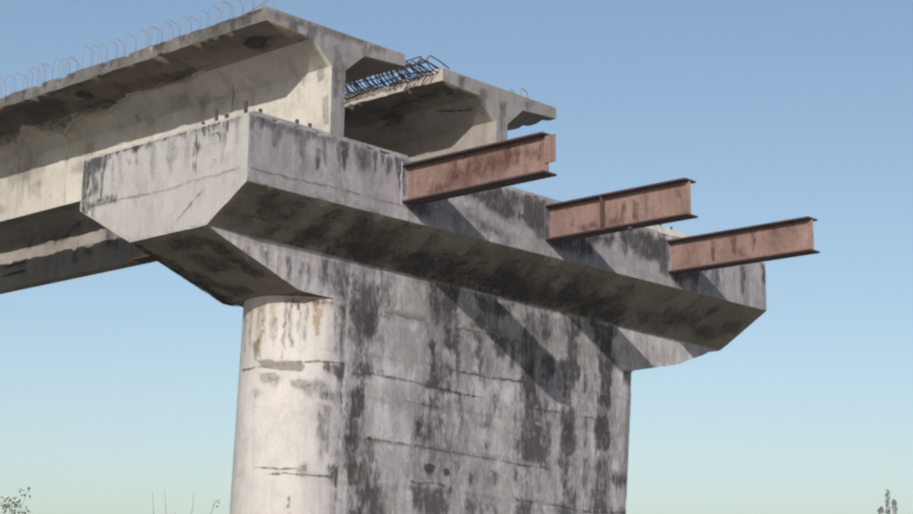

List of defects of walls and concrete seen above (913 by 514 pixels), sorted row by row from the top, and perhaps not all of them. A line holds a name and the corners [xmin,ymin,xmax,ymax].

water stain [82,142,151,214]
water stain [464,188,719,291]
corrosion [282,293,325,335]
water stain [239,190,646,514]